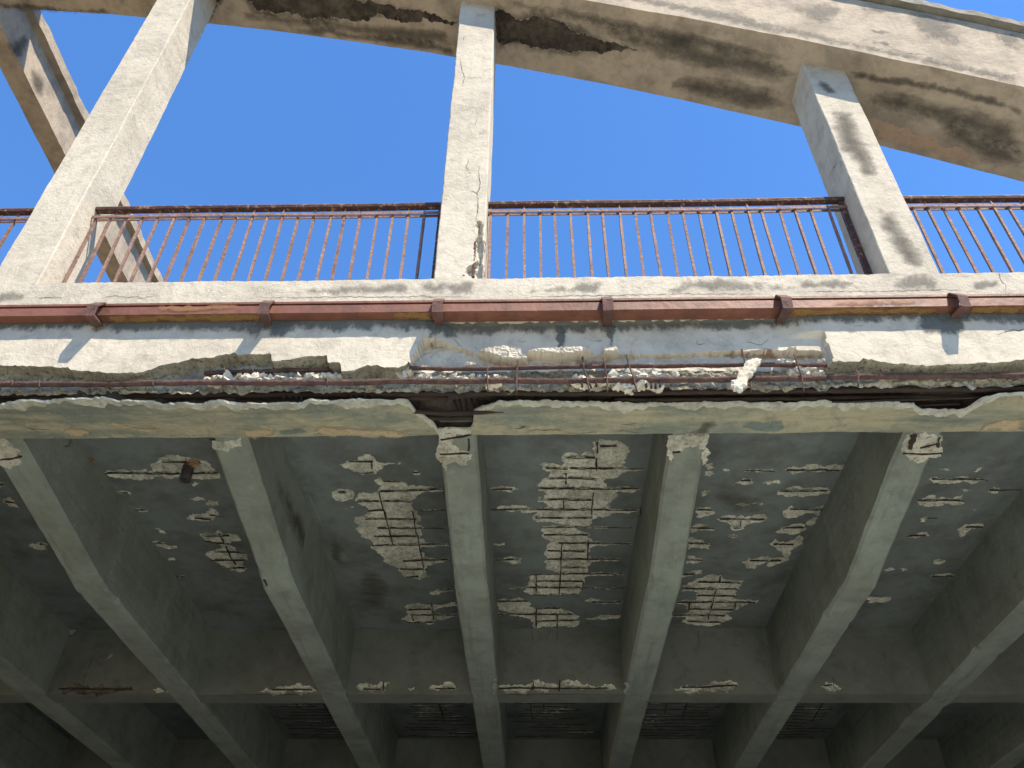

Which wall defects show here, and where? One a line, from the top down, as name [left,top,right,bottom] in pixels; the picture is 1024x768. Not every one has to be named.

leakage [571,14,774,73]
leakage [684,82,770,104]
leakage [642,0,1014,79]
leakage [839,116,871,172]
leakage [857,74,941,90]
leakage [885,218,914,262]
spalling [0,349,1024,470]
spalling [104,455,248,573]
spalling [332,454,452,580]
spalling [490,439,646,628]
spalling [672,490,767,626]
spalling [901,432,1023,538]